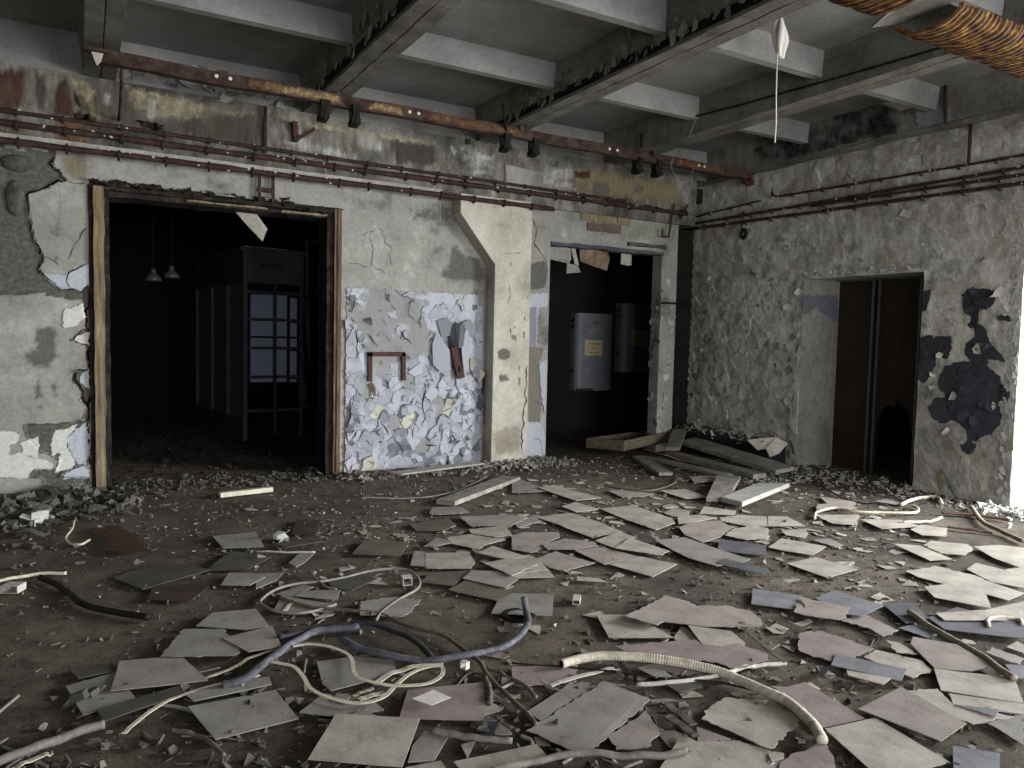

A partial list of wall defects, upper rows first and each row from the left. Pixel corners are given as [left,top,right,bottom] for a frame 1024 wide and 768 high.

corrosion [0,68,24,109]
spalling [0,147,92,488]
crack [355,227,393,271]
peeling [344,286,485,472]
flaking render [580,213,631,234]
peeling [690,223,916,461]
water stain [755,107,897,159]
peeling [918,224,1024,500]